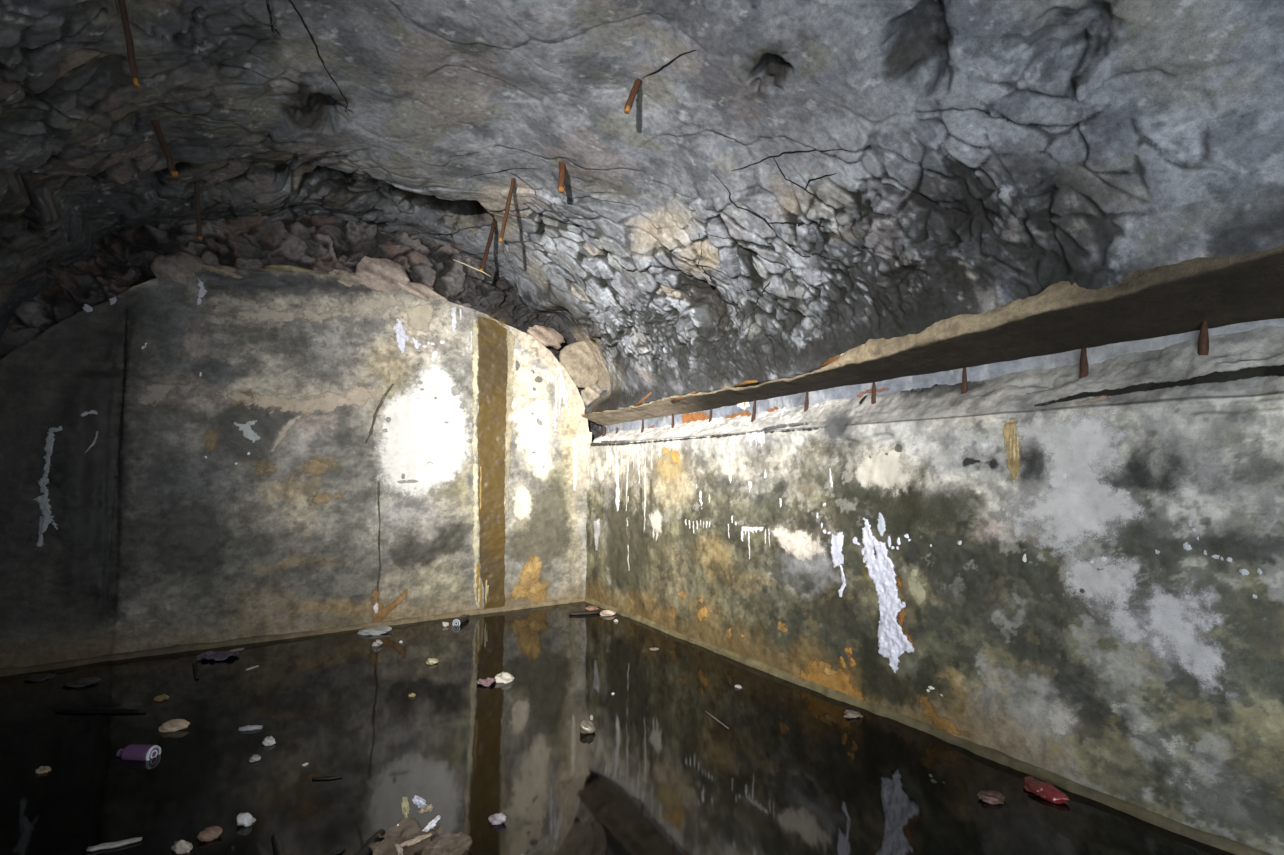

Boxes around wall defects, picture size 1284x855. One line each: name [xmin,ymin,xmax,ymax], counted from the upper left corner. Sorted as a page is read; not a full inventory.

crack [266,0,348,109]
crack [698,149,847,327]
crack [1034,364,1284,406]
rust [472,317,551,609]
water stain [593,443,661,589]
spalling [649,509,662,541]
water stain [728,516,770,559]
spalling [772,525,831,586]
rust [670,591,709,621]
water stain [816,482,973,708]
peeling [897,568,927,646]
rust [797,647,865,701]